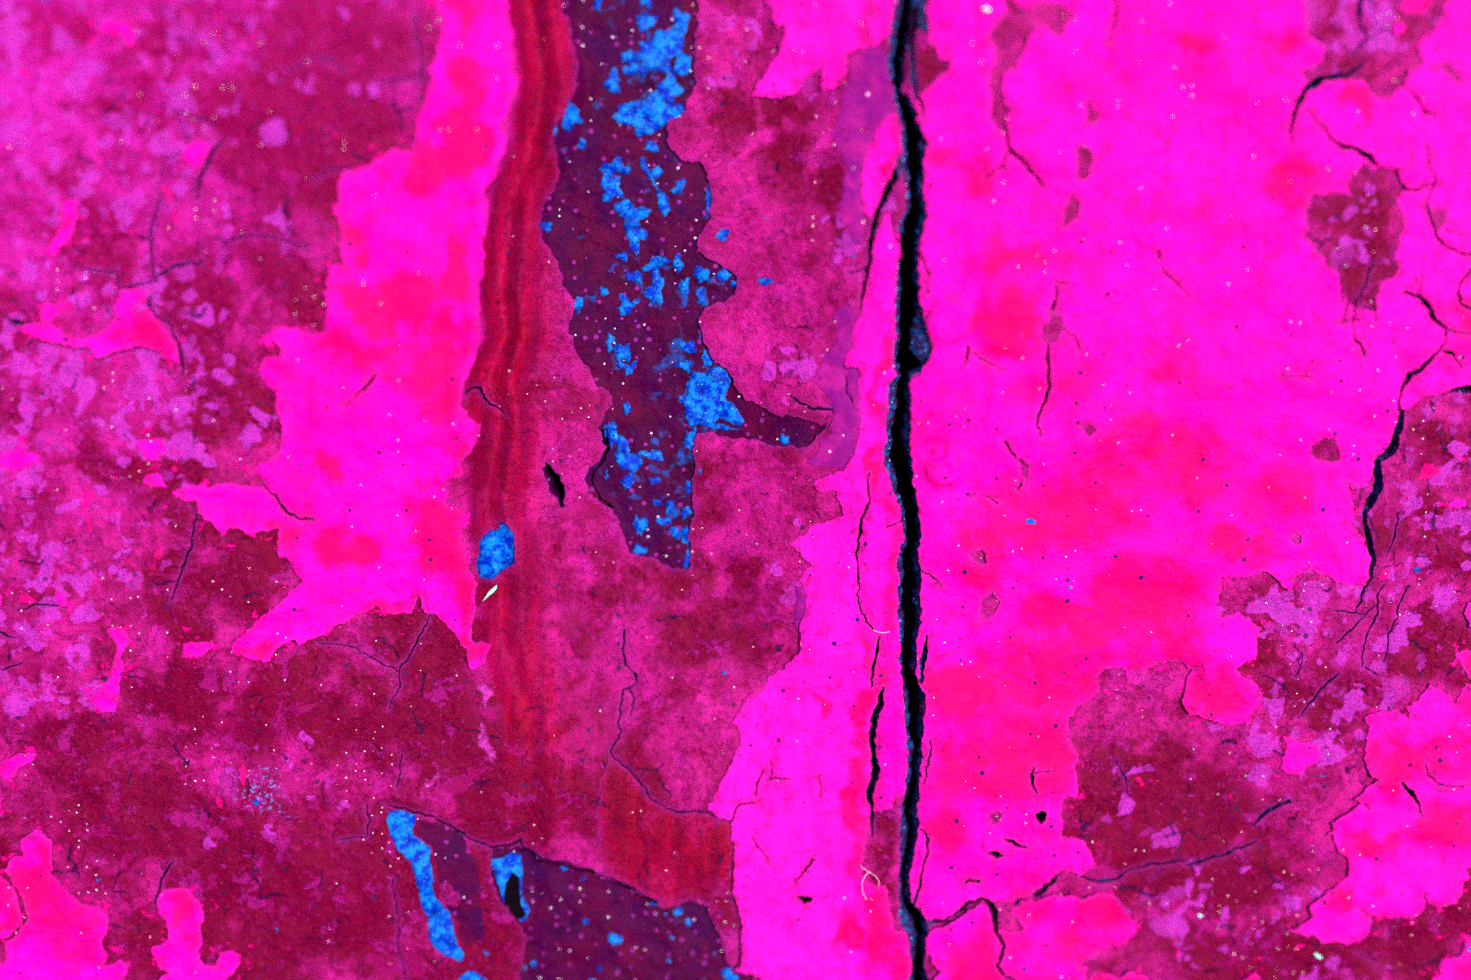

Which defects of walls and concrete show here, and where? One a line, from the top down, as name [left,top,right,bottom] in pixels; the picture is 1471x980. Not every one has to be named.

peeling [1302,0,1461,98]
peeling [1302,164,1404,310]
peeling [17,287,180,365]
peeling [136,0,518,670]
crack [1289,0,1471,716]
water stain [477,522,515,579]
crack [789,0,1290,980]
water stain [478,685,495,761]
peeling [0,828,130,980]
peeling [151,888,241,980]
peeling [595,756,735,908]
peeling [925,891,1148,980]